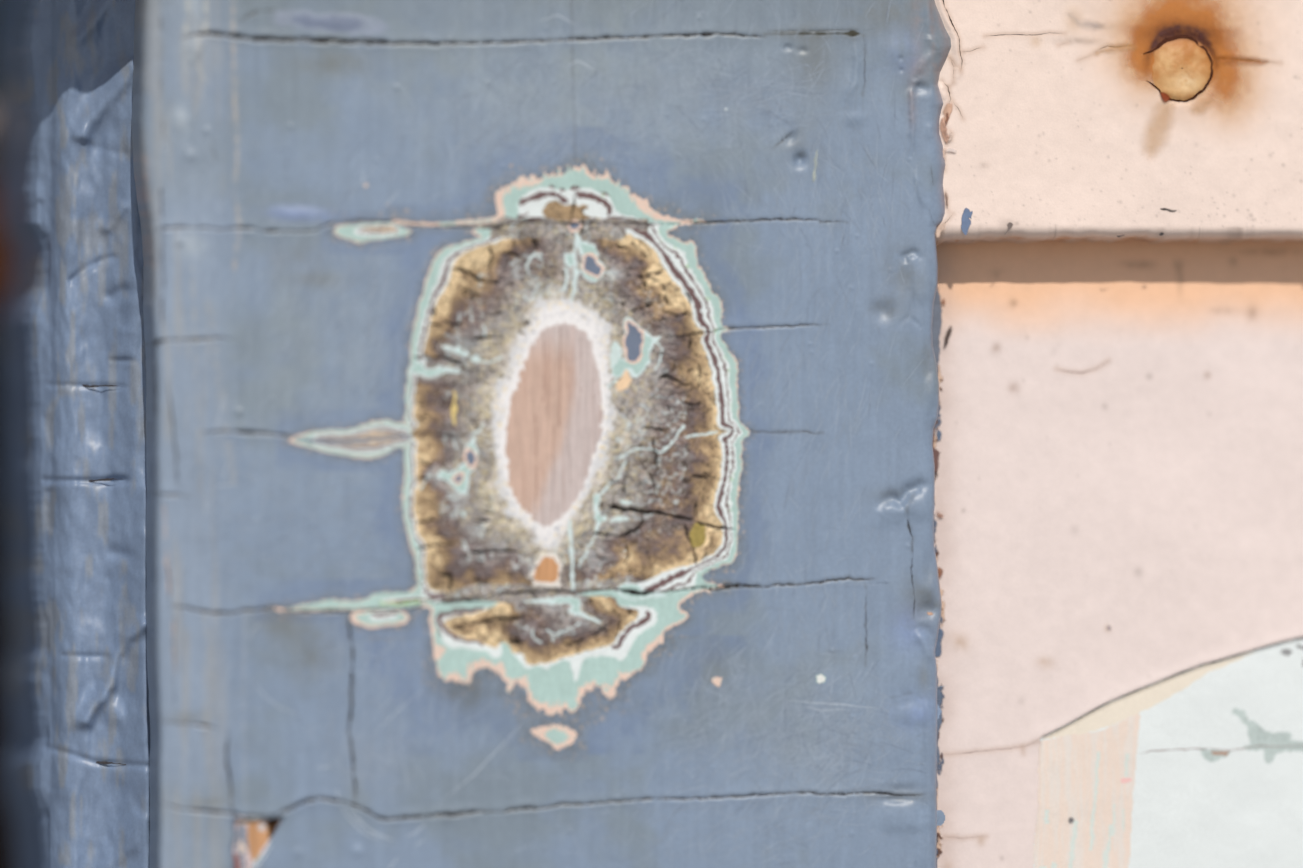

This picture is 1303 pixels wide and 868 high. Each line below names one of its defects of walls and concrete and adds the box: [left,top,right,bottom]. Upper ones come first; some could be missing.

crack [185,10,762,46]
corrosion [1125,0,1250,104]
crack [82,382,117,390]
crack [154,189,924,820]
crack [96,759,126,767]
peeling [1033,637,1303,868]
peeling [231,816,282,868]